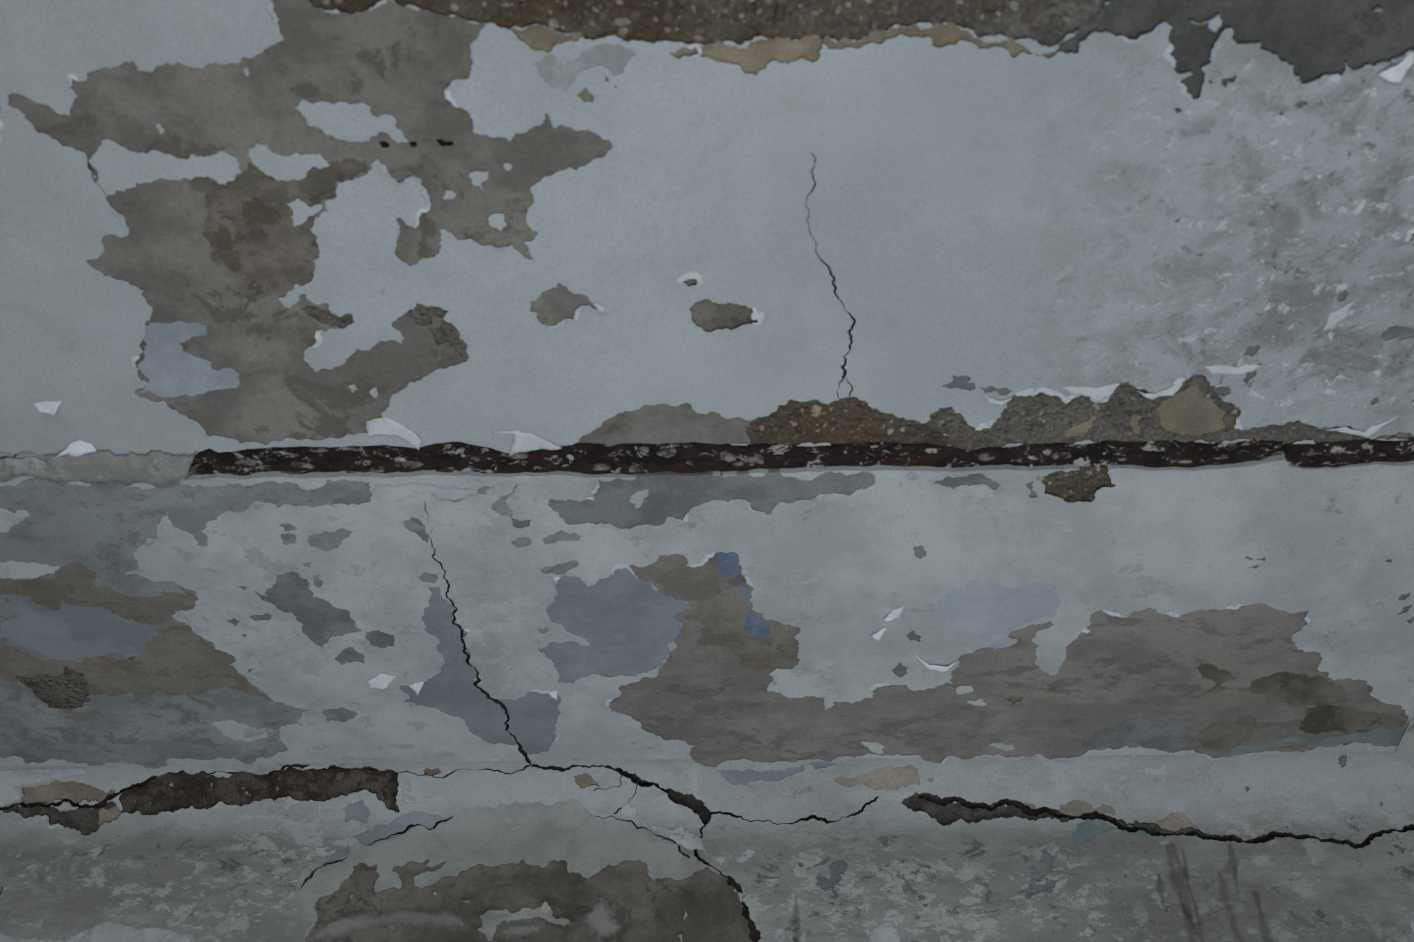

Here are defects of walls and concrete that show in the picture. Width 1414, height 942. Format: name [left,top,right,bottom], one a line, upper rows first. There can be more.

peeling [0,0,1414,456]
crack [806,153,856,398]
peeling [52,440,96,459]
peeling [431,469,876,548]
spalling [1026,466,1116,503]
peeling [0,478,400,836]
crack [0,503,879,877]
peeling [367,552,1409,853]
crack [300,816,453,889]
peeling [287,773,761,942]
damp [869,921,900,942]
crack [918,795,1414,849]